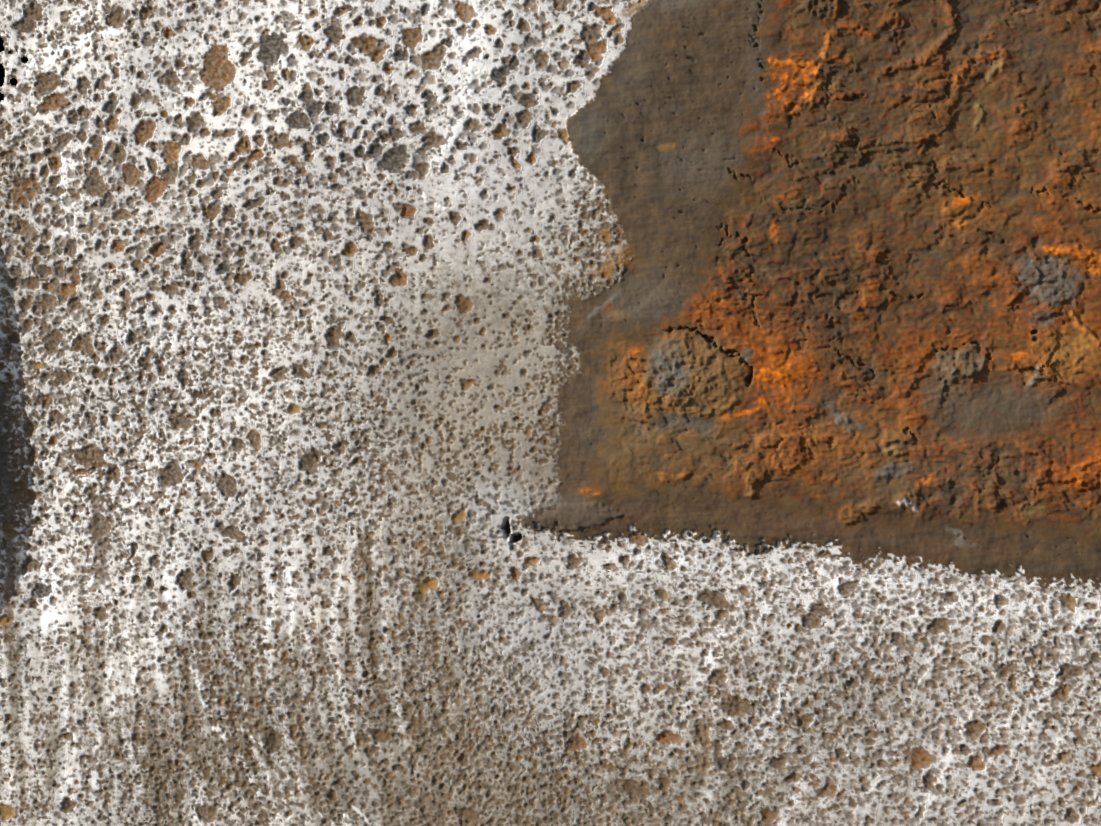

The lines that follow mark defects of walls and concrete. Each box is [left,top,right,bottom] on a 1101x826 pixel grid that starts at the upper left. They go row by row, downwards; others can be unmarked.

spalling [574,5,619,66]
spalling [565,80,583,95]
crack [734,292,764,329]
rust [555,0,1101,599]
peeling [1004,246,1092,329]
crack [668,325,755,388]
peeling [913,342,1077,449]
peeling [870,426,921,483]
hole [509,555,542,584]
hole [566,553,582,572]
spalling [659,551,677,571]
hole [530,595,574,620]